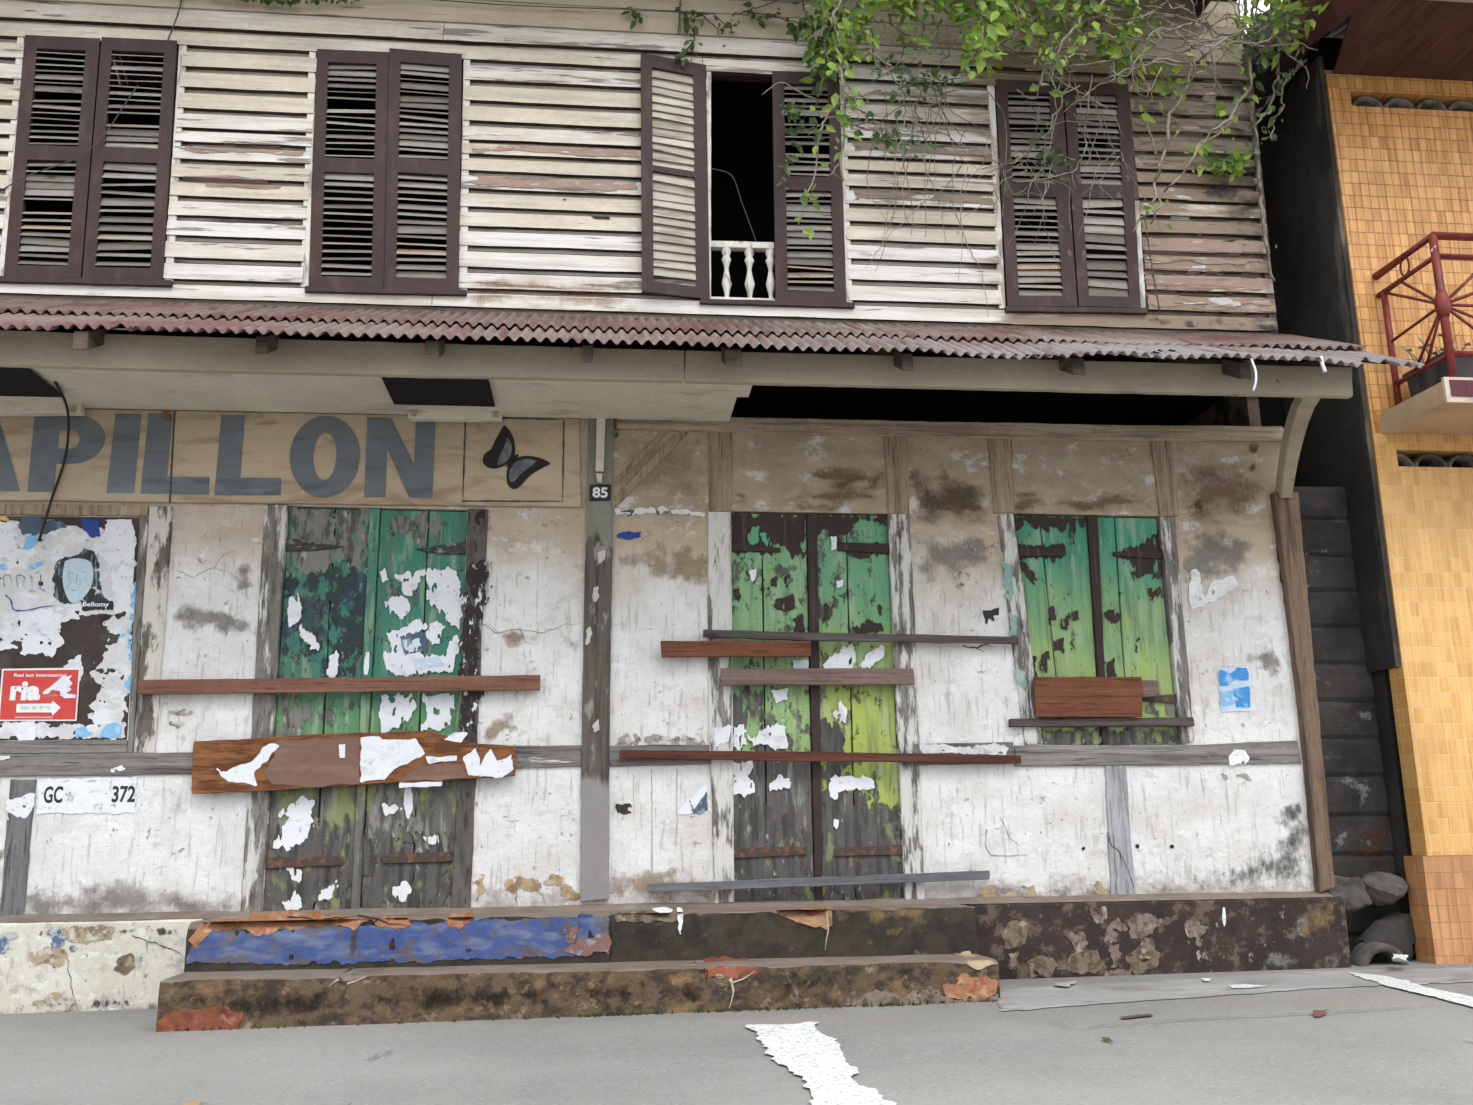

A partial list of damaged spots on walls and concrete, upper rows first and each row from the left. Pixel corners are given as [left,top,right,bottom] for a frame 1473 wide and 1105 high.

peeling [280,506,370,678]
peeling [458,559,493,734]
peeling [731,512,888,634]
water stain [911,475,981,516]
water stain [925,541,985,572]
water stain [1069,495,1129,510]
water stain [1184,445,1259,575]
peeling [186,783,684,965]
peeling [733,717,904,950]
peeling [0,924,114,967]
water stain [230,990,326,1018]
water stain [422,987,544,1008]